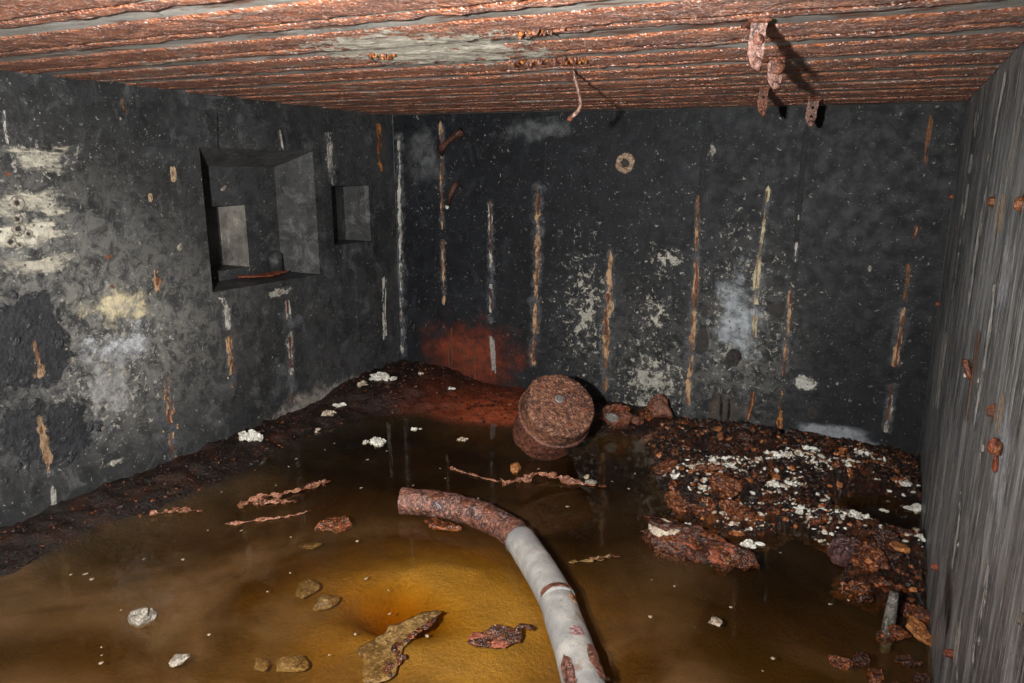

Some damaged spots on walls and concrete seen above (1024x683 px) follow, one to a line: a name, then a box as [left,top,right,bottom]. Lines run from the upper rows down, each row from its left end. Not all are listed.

rust [368,53,393,61]
rust [516,28,566,40]
rust [508,56,589,68]
water stain [695,268,788,366]
rust [427,328,502,382]
rust [37,415,53,476]